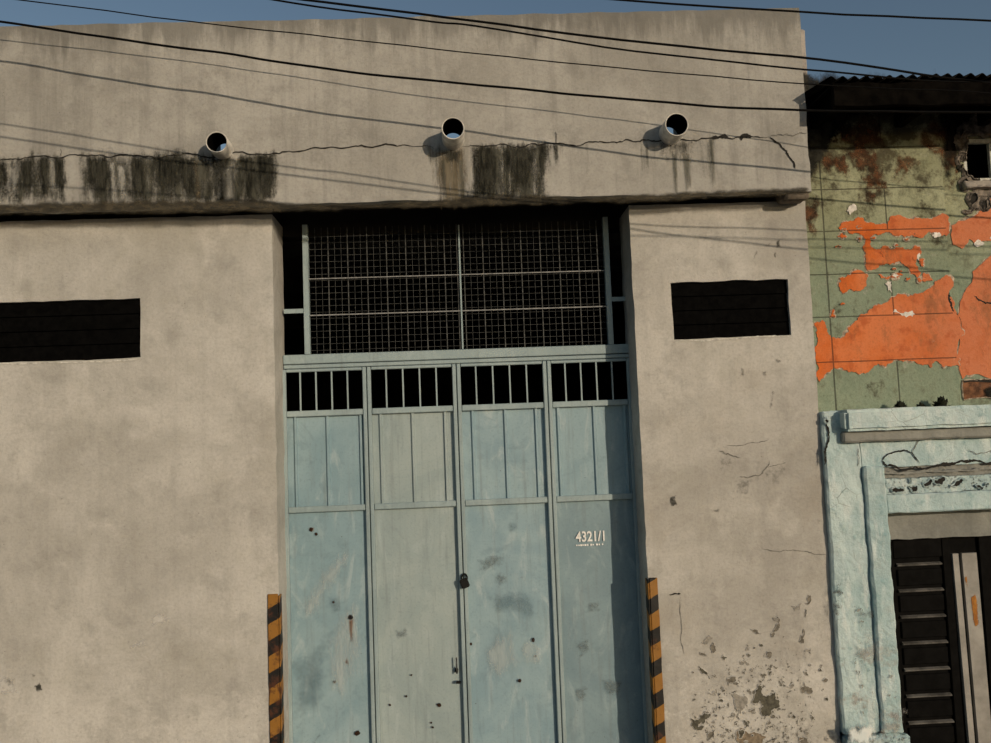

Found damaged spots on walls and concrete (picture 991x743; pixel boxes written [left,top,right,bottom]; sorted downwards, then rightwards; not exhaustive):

water stain [803,73,835,176]
water stain [0,154,66,203]
water stain [82,151,277,203]
crack [1,143,433,160]
water stain [430,142,557,200]
crack [463,132,807,169]
peeling [813,113,991,400]
crack [720,440,784,478]
crack [858,440,991,471]
peeling [890,476,989,494]
peeling [690,595,829,743]